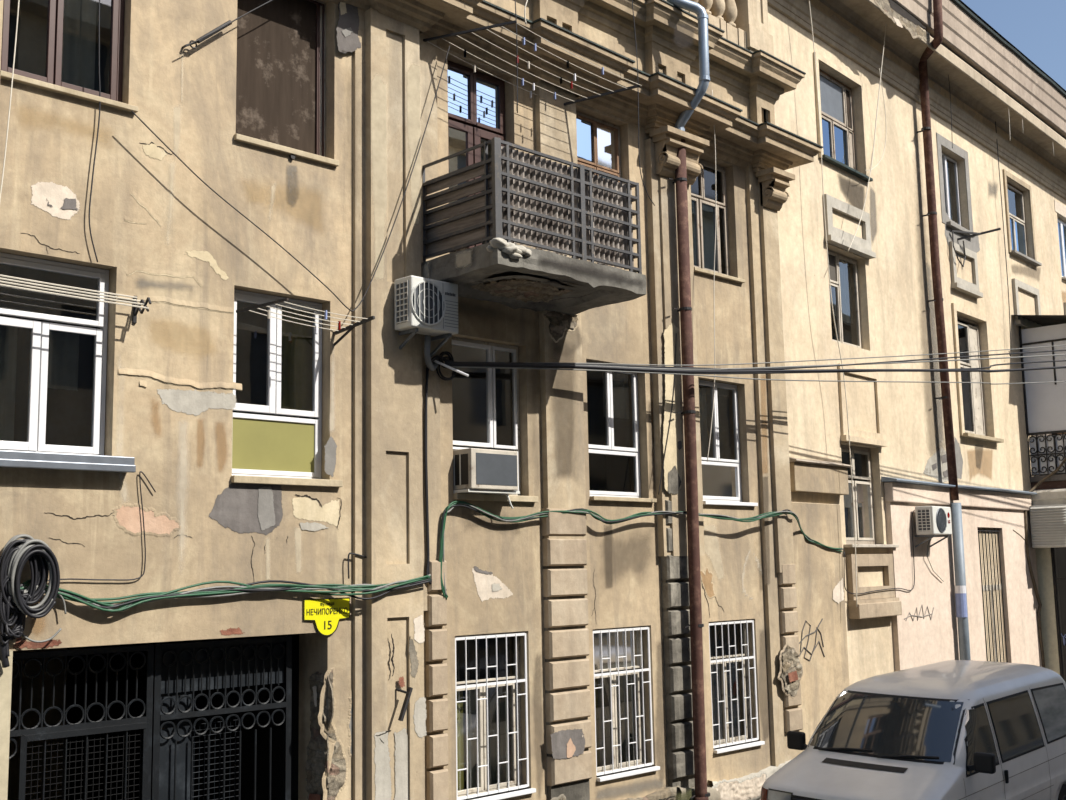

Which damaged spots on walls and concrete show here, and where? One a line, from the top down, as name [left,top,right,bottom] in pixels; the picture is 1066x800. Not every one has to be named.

peeling [336,2,361,54]
peeling [874,0,930,43]
peeling [31,182,80,220]
crack [23,233,80,254]
peeling [157,389,237,416]
crack [51,512,114,547]
spalling [112,502,182,537]
peeling [209,483,340,535]
peeling [472,566,513,602]
spalling [778,644,803,698]
spalling [305,667,353,800]
peeling [374,697,427,800]